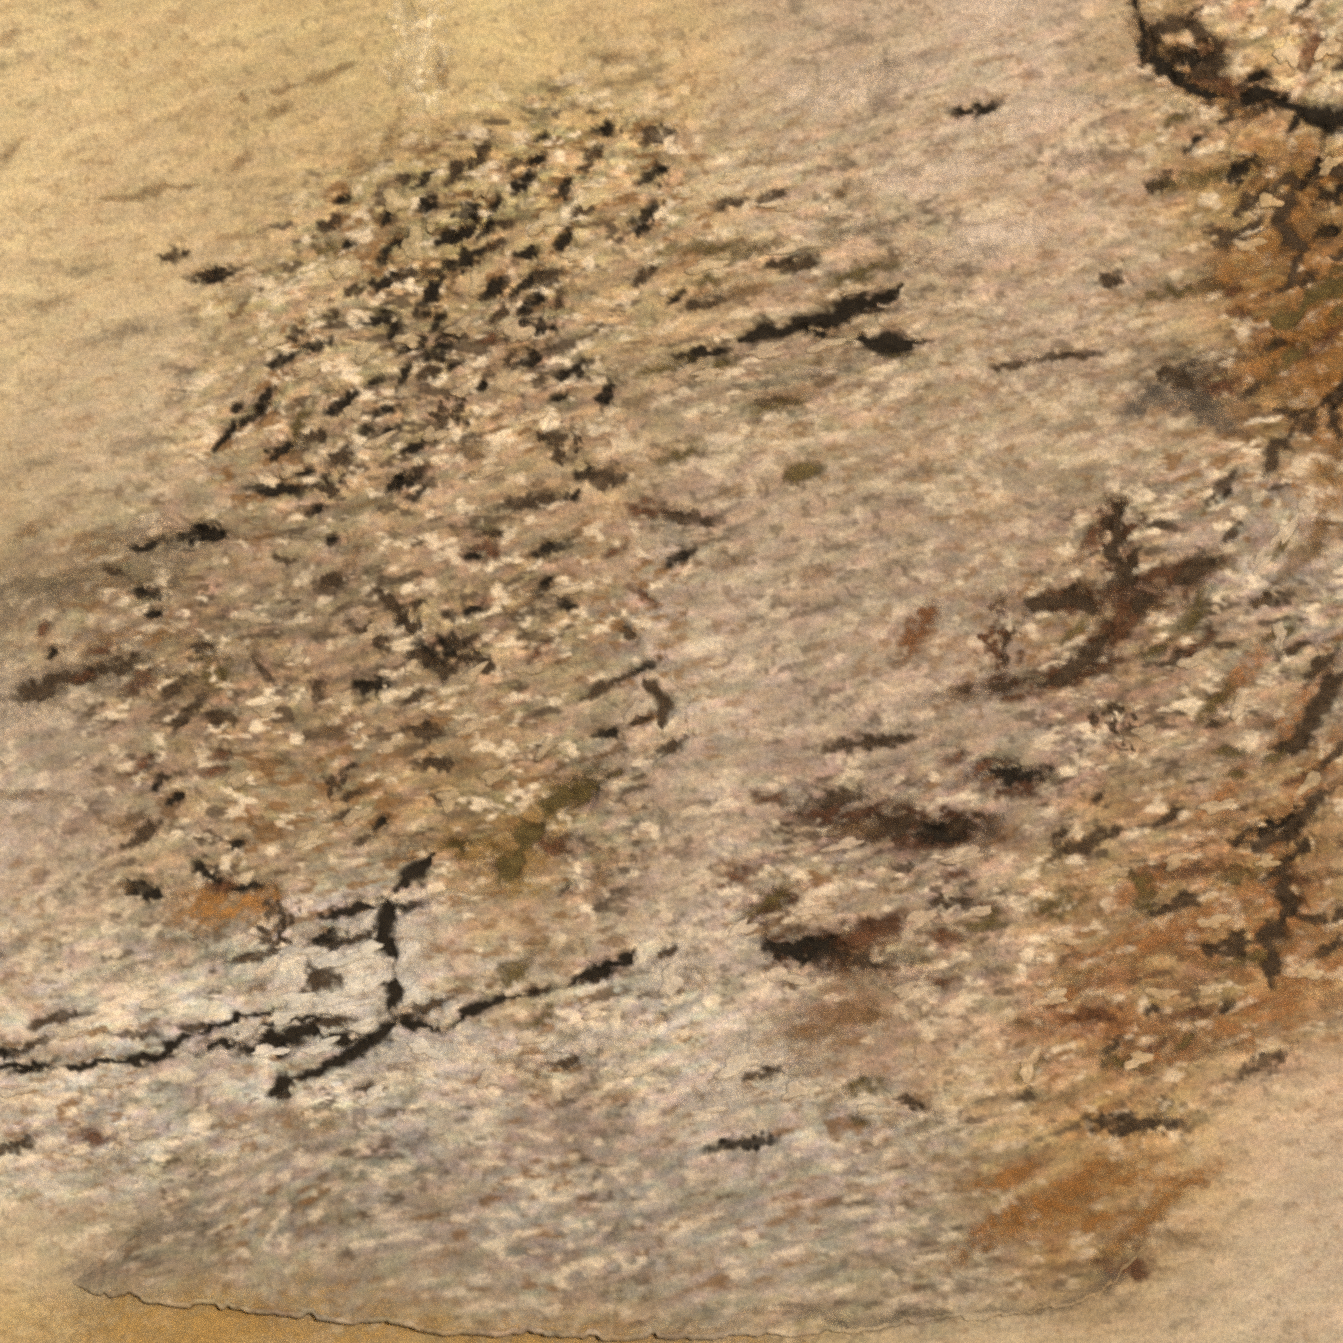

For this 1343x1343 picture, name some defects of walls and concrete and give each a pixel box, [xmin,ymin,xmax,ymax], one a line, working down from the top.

crack [1131,0,1343,329]
crack [497,771,622,881]
rust [1238,876,1308,961]
crack [0,841,534,1097]
crack [567,950,635,988]
rust [1054,984,1135,1038]
rust [973,1161,1204,1246]